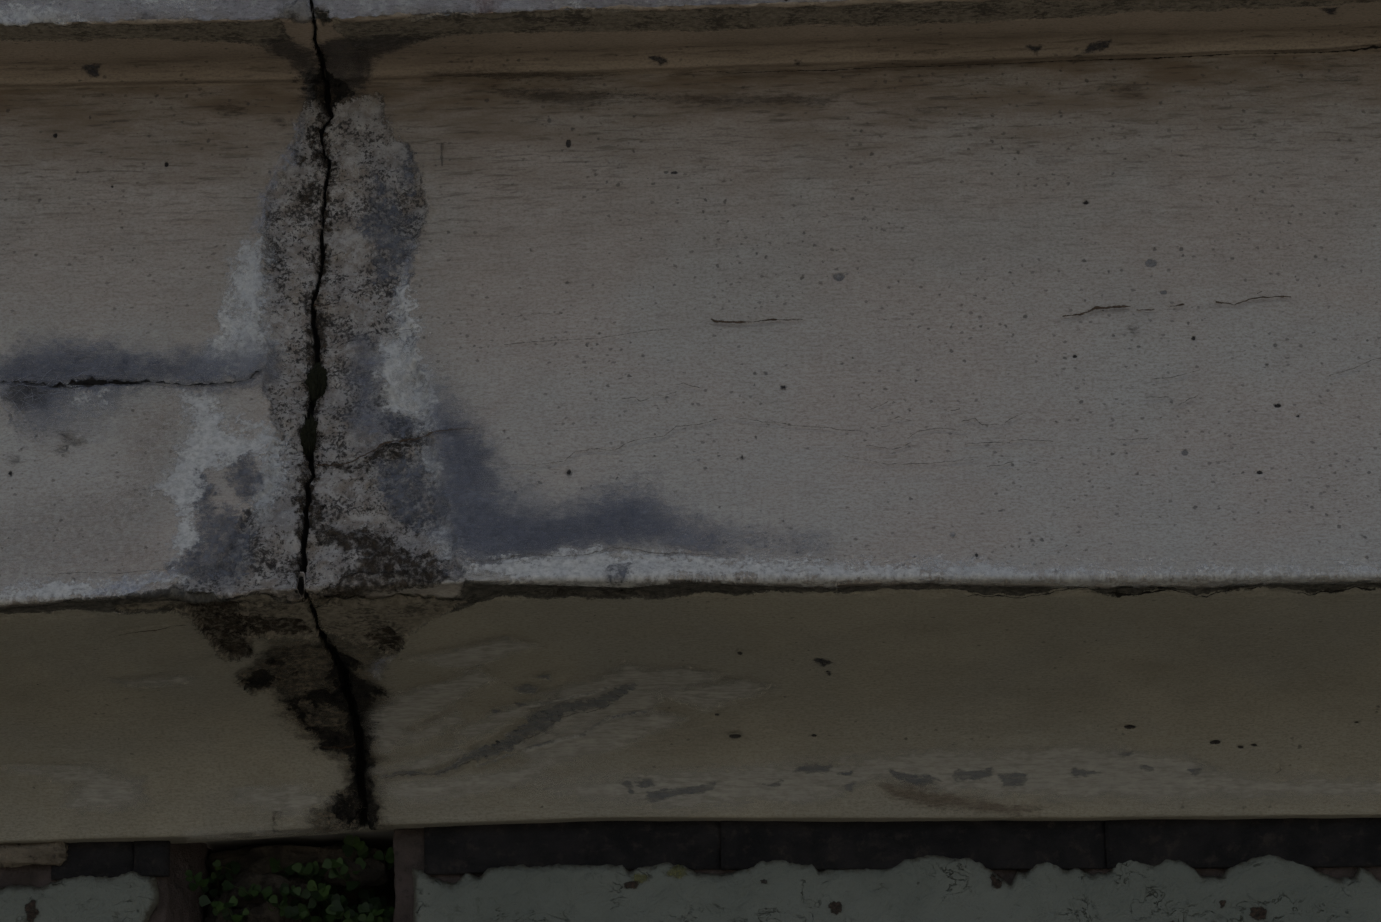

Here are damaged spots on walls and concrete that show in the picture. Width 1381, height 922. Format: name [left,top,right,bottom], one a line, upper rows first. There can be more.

crack [2,0,350,420]
water stain [0,236,287,605]
crack [297,428,647,827]
water stain [279,630,765,834]